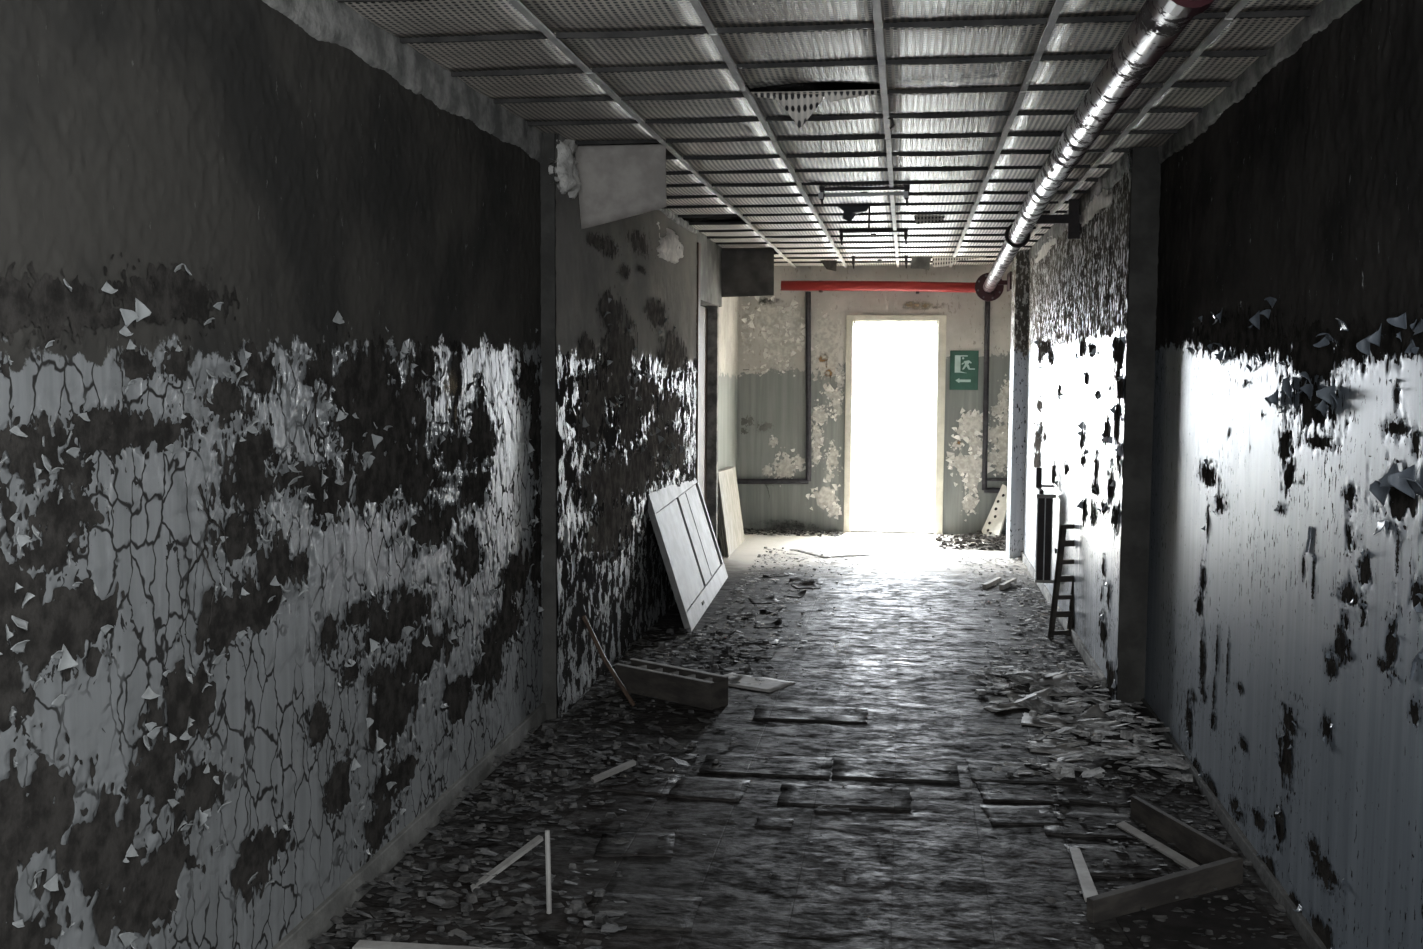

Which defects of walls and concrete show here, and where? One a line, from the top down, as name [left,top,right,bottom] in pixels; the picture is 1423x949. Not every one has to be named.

crack [184,484,229,625]
peeling [564,222,694,574]
spalling [1035,236,1057,263]
peeling [1032,312,1126,697]
spalling [1079,189,1113,226]
peeling [1185,597,1346,949]
peeling [1172,297,1423,695]
peeling [1407,696,1422,728]